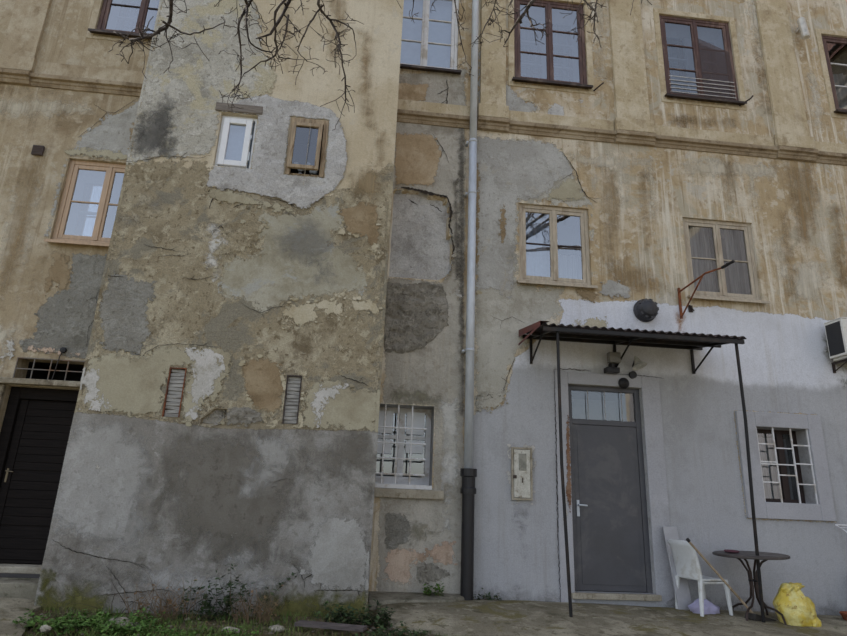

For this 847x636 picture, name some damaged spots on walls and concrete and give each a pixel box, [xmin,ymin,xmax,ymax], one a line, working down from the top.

flaking render [282,133,462,354]
peeling [475,137,573,299]
peeling [0,251,157,361]
crack [53,540,172,604]
peeling [382,513,458,586]